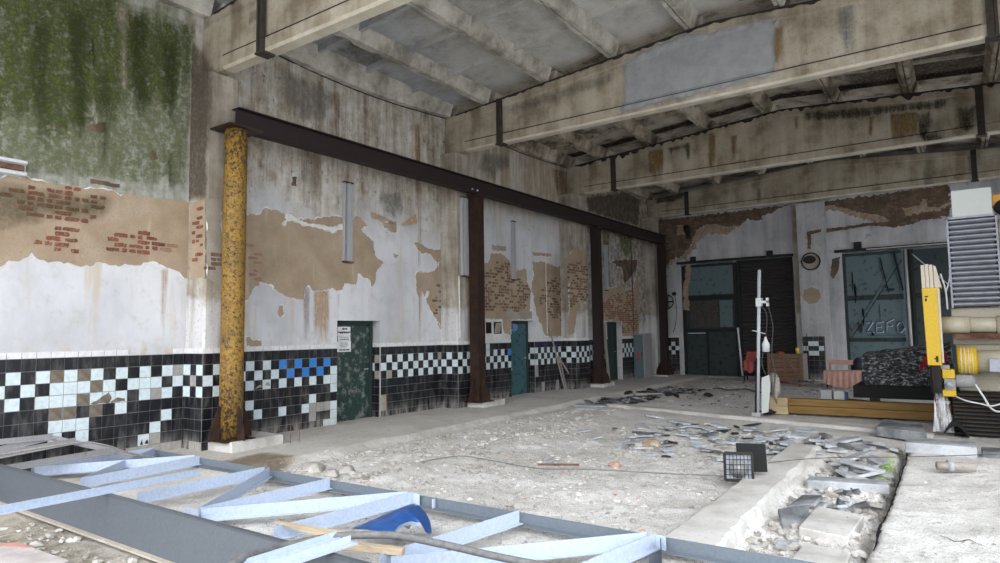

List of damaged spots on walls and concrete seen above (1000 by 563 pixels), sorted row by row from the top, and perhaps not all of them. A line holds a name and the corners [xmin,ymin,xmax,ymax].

peeling [0,175,223,294]
peeling [245,206,384,318]
peeling [484,244,589,337]
peeling [603,259,639,336]
spalling [659,204,792,310]
spalling [830,257,840,279]
spalling [825,185,951,227]
peeling [49,369,125,421]